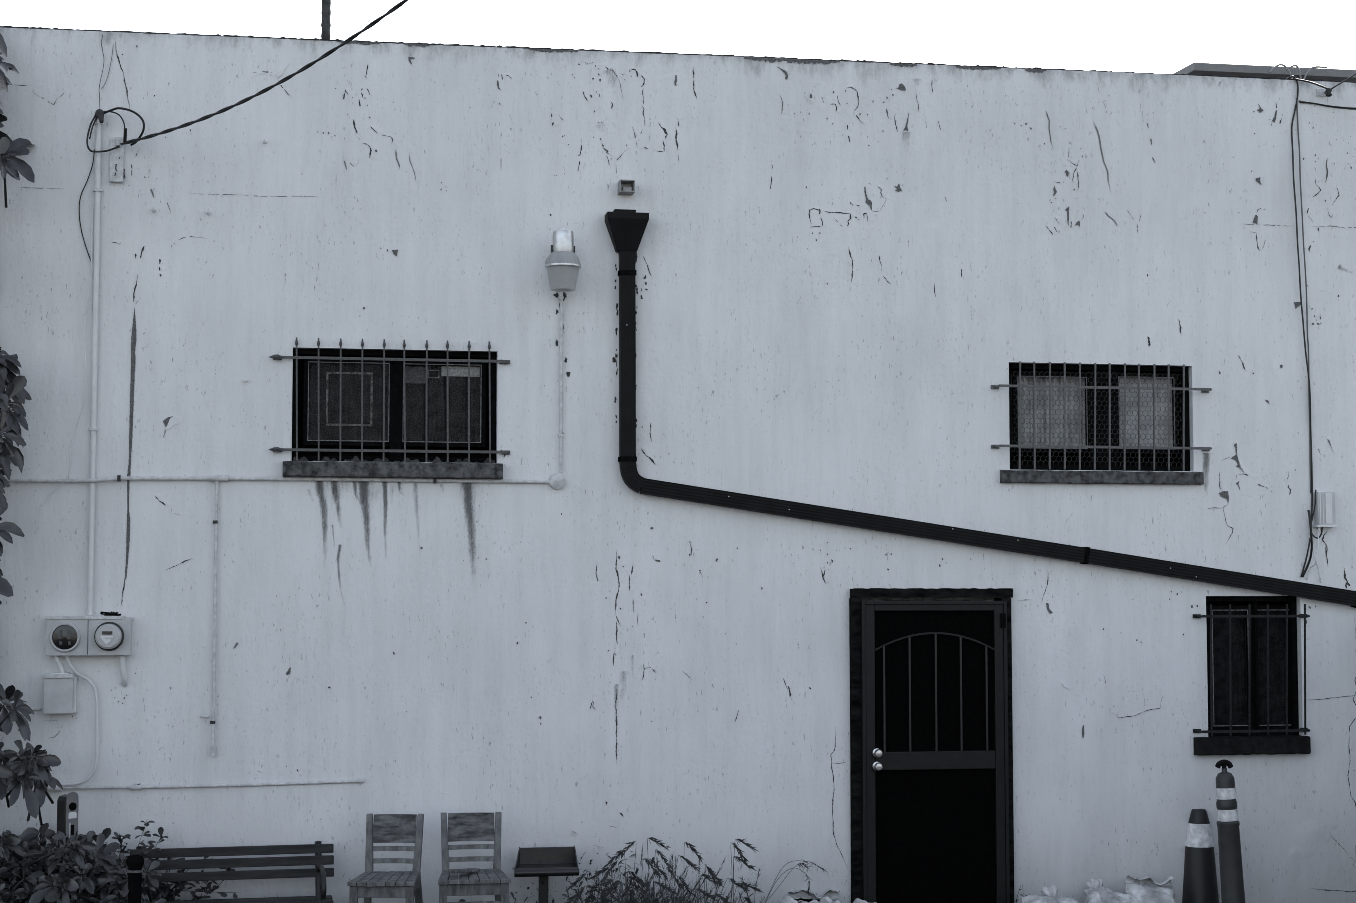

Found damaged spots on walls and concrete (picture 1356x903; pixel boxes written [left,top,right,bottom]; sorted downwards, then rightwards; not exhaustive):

spalling [529,48,623,97]
spalling [744,57,840,79]
peeling [593,110,668,173]
peeling [855,178,902,220]
peeling [1238,208,1265,250]
peeling [1208,443,1268,509]
damp [317,481,339,533]
damp [353,481,400,534]
damp [463,483,473,552]
crack [1313,677,1356,806]
crack [1312,835,1356,892]